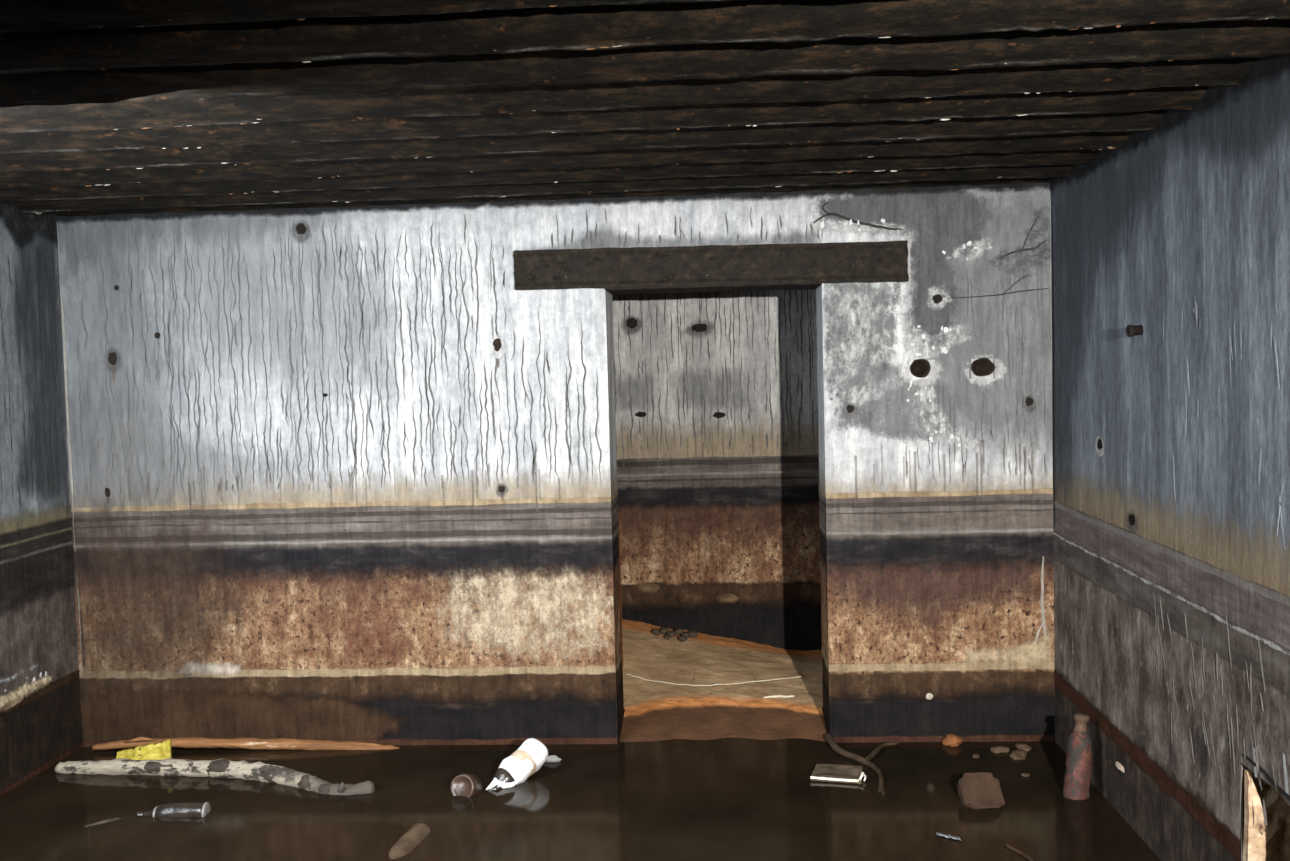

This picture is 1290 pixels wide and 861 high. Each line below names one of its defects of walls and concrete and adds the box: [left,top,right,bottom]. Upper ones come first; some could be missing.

leakage [0,220,819,790]
rust [75,501,1240,861]
peeling [812,190,993,454]
leakage [621,134,1290,861]
spalling [964,355,1006,386]